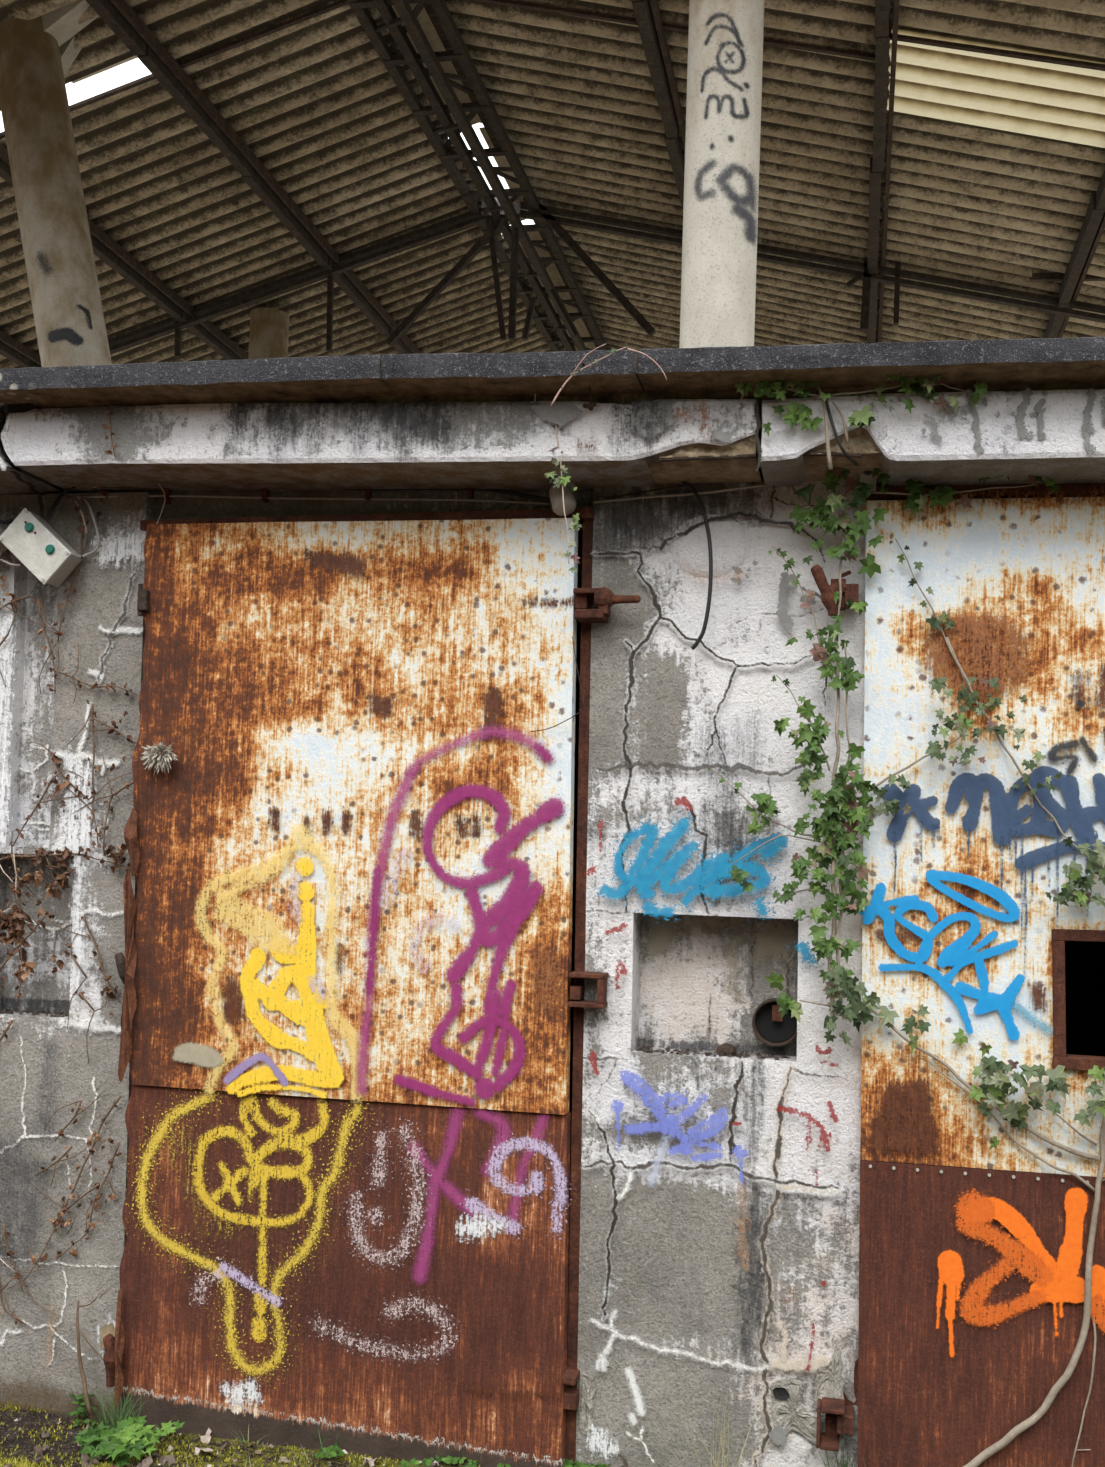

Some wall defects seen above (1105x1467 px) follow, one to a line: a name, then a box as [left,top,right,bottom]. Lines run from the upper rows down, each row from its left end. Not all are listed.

crack [0,411,45,519]
corrosion [523,595,575,608]
crack [587,397,841,915]
corrosion [478,682,507,741]
corrosion [268,806,280,832]
corrosion [304,807,352,835]
corrosion [409,808,423,841]
crack [68,1019,121,1033]
corrosion [221,975,245,1027]
crack [0,1037,98,1186]
crack [582,1056,840,1467]
crack [0,1255,116,1365]